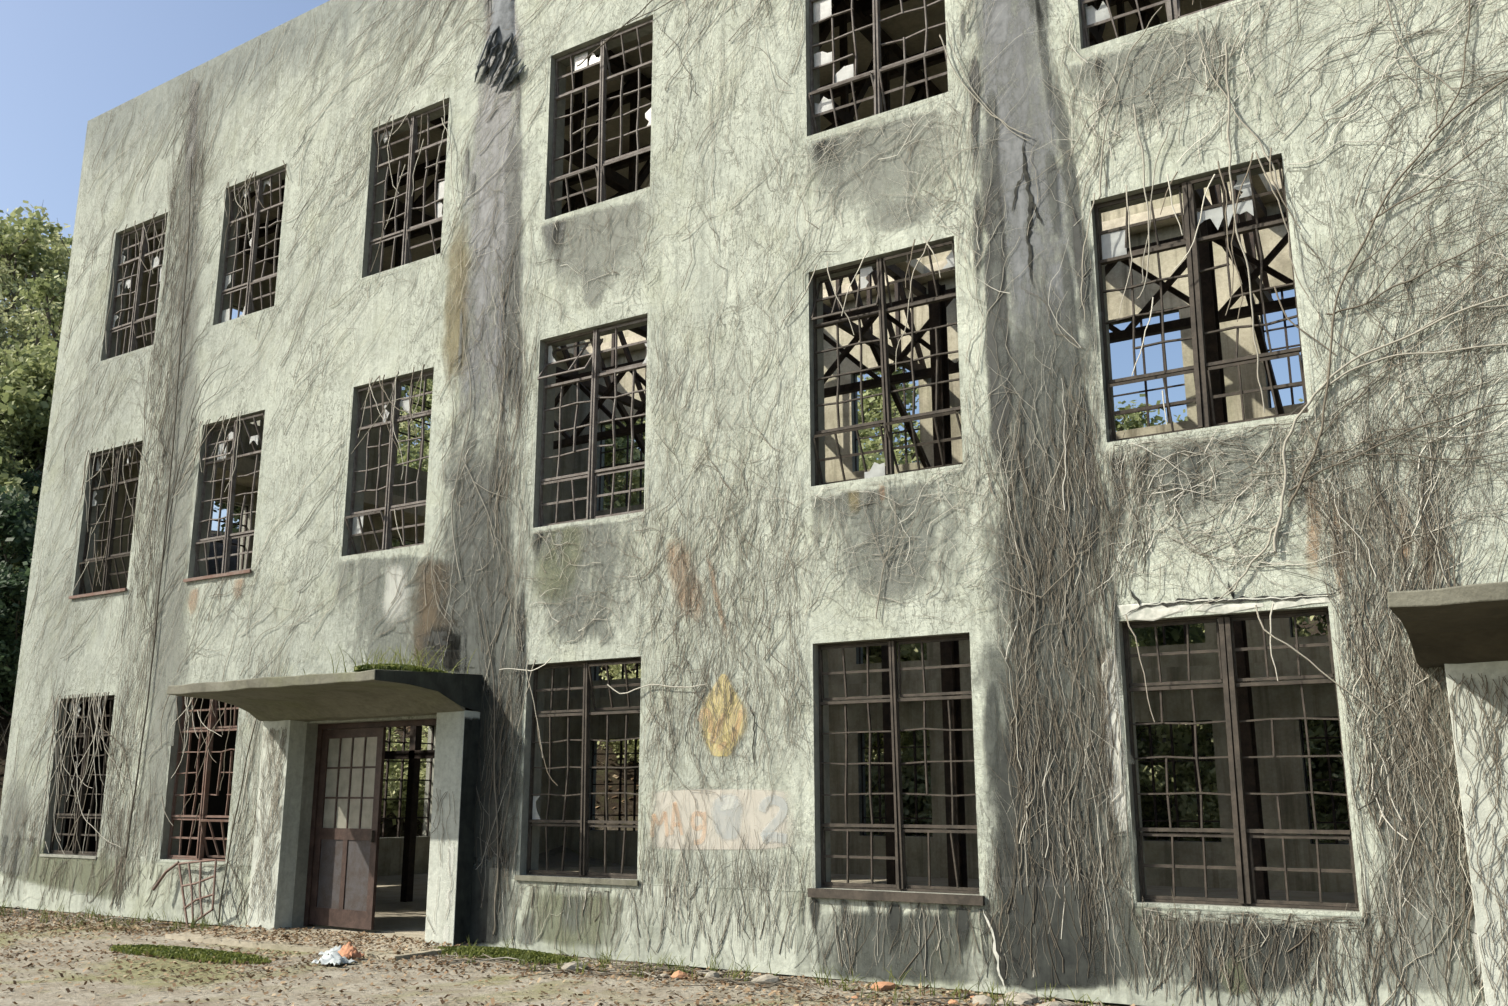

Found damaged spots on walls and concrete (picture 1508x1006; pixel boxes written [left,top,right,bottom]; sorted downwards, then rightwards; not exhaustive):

water stain [446,0,522,411]
water stain [339,434,630,945]
water stain [809,898,819,928]
water stain [813,0,1313,992]